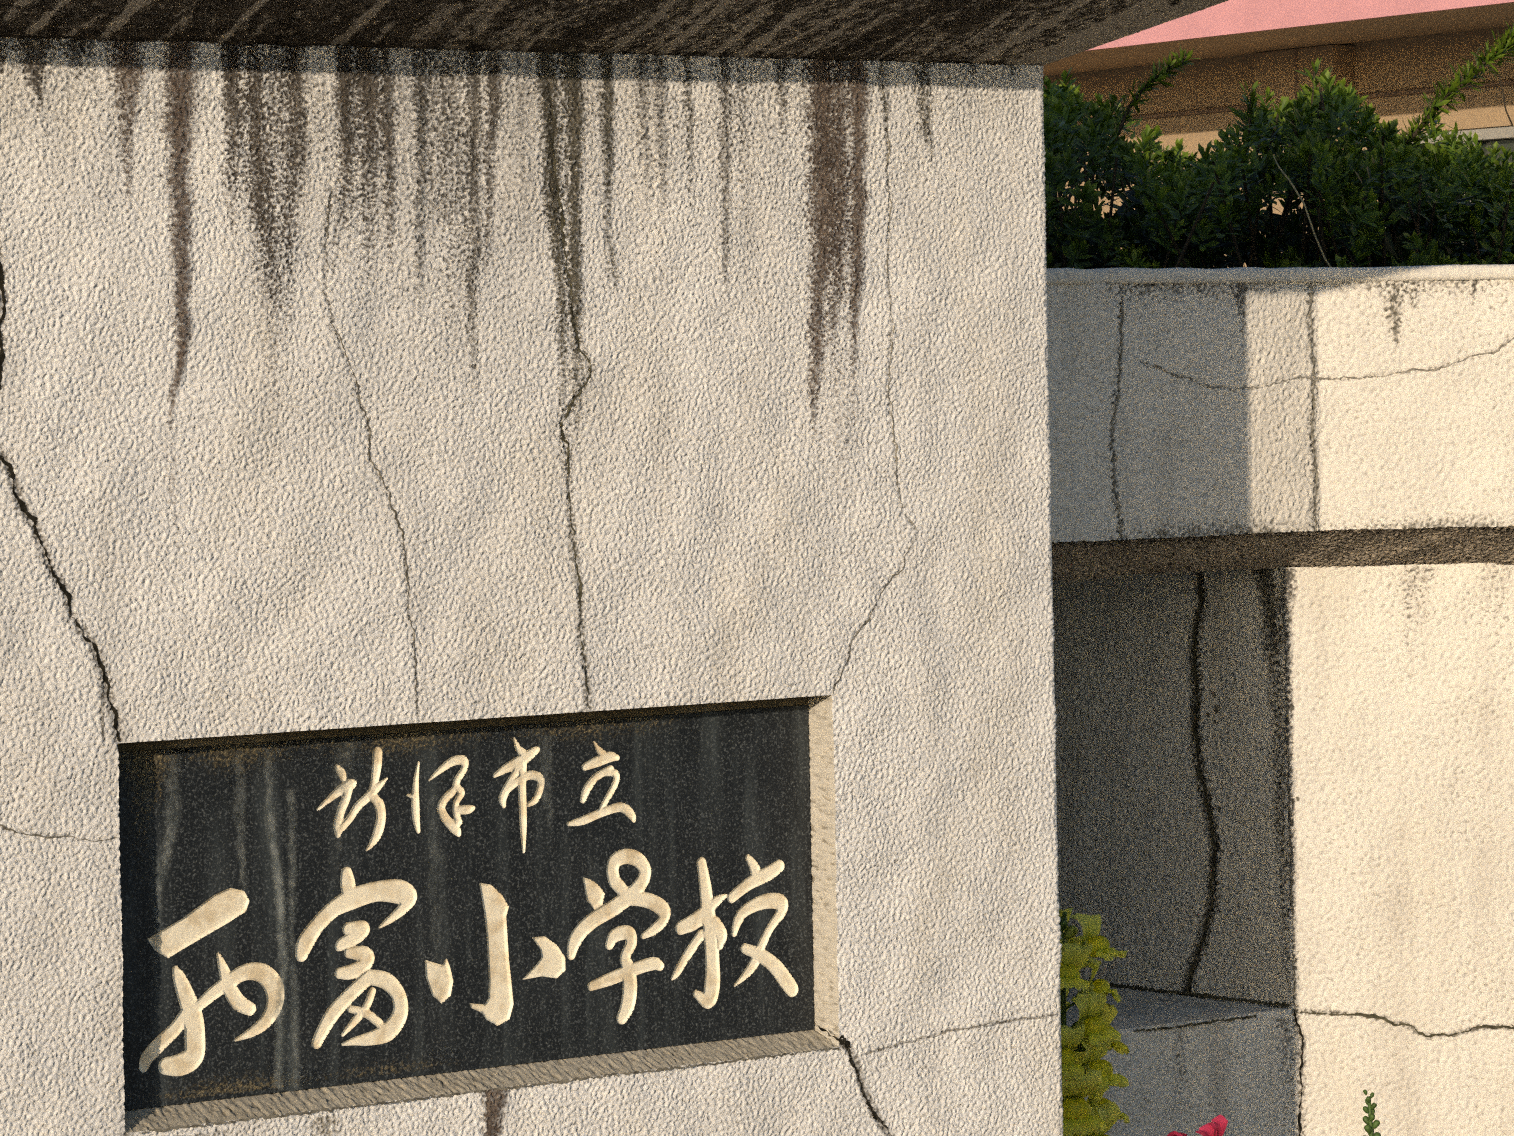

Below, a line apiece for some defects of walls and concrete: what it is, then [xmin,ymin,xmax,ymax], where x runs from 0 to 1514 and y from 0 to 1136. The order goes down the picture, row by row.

crack [0,246,8,390]
crack [0,447,122,742]
crack [324,190,418,714]
damp [0,0,1138,428]
crack [548,91,595,709]
crack [833,87,918,692]
damp [1130,283,1270,333]
crack [1109,283,1514,539]
crack [0,824,116,842]
crack [1086,571,1514,1136]
crack [124,1014,1056,1136]